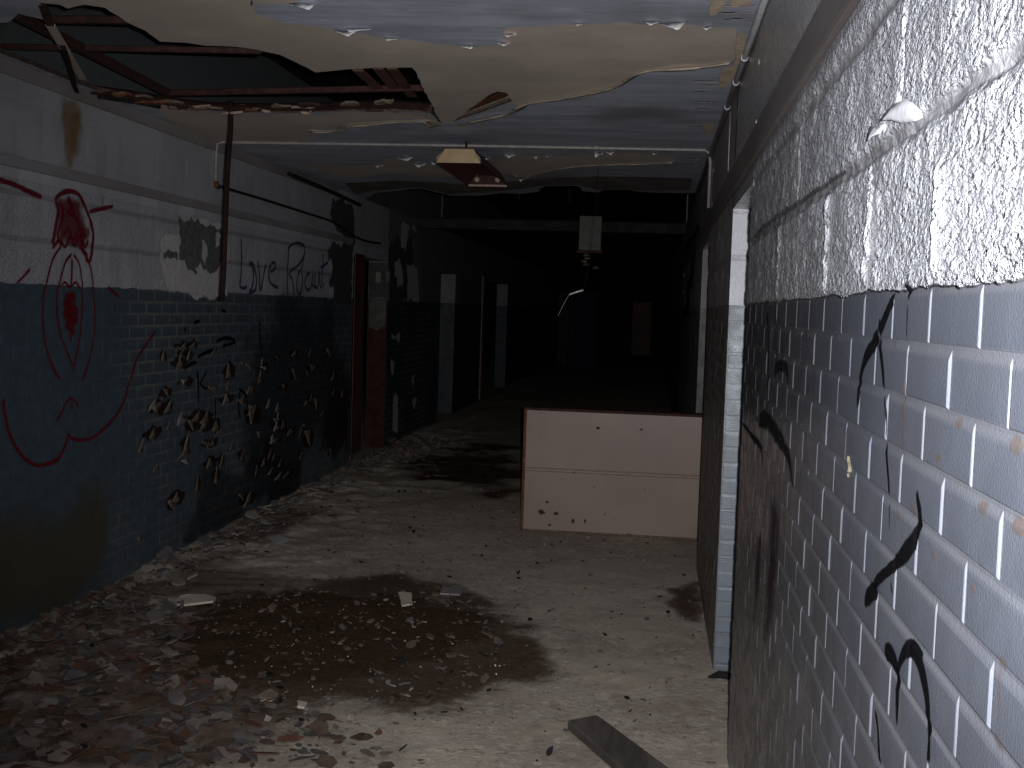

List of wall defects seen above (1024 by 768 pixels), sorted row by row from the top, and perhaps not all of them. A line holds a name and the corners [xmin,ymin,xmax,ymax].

peeling [38,0,757,145]
spalling [159,216,229,300]
peeling [138,339,349,511]